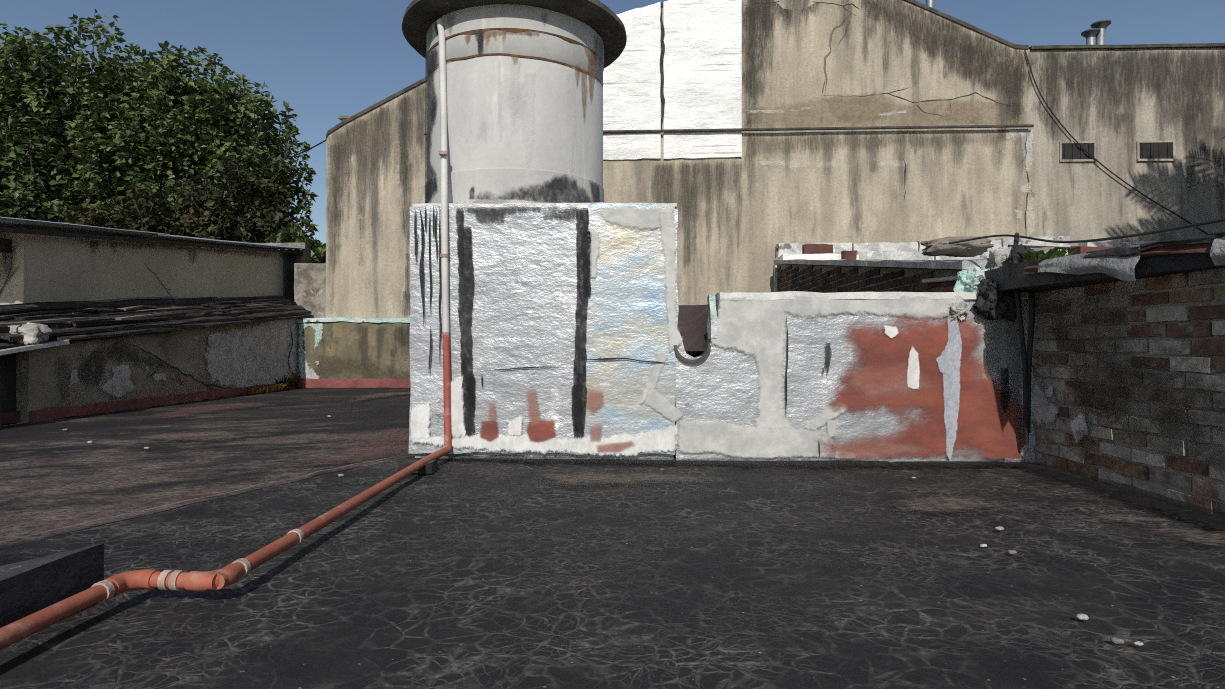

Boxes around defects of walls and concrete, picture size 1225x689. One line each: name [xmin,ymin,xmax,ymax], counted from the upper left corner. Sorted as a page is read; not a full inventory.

crack [813,1,1034,226]
leakage [863,0,1225,129]
leakage [348,157,364,277]
flaking render [102,364,134,397]
flaking render [205,318,323,388]
leakage [395,326,409,346]